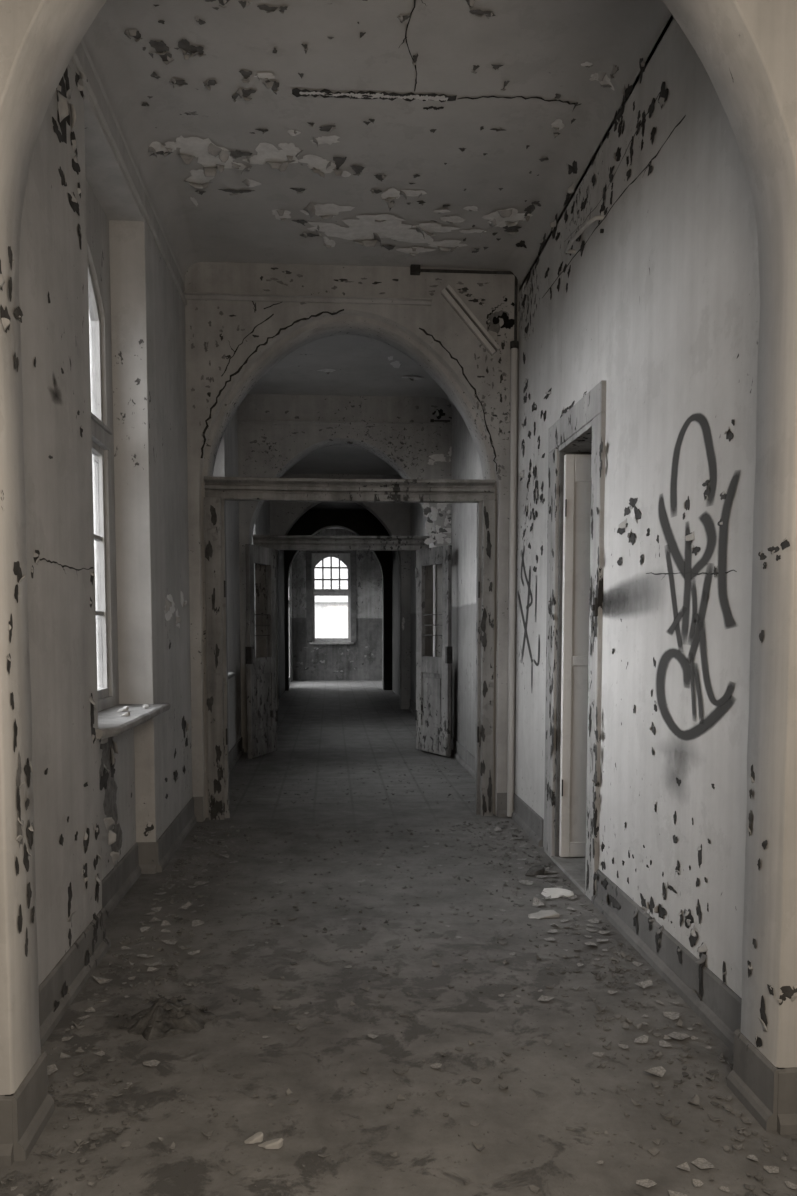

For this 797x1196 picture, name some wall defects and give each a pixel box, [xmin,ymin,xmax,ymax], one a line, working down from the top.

crack [399,0,426,91]
crack [458,96,582,105]
flaking render [148,58,669,572]
crack [37,558,93,574]
peeling [589,507,599,655]
peeling [546,674,554,758]
flaking render [59,693,122,947]
peeling [210,745,222,820]
peeling [480,706,710,1001]
peeling [746,765,767,870]
peeling [618,1000,712,1049]
peeling [755,984,797,1047]